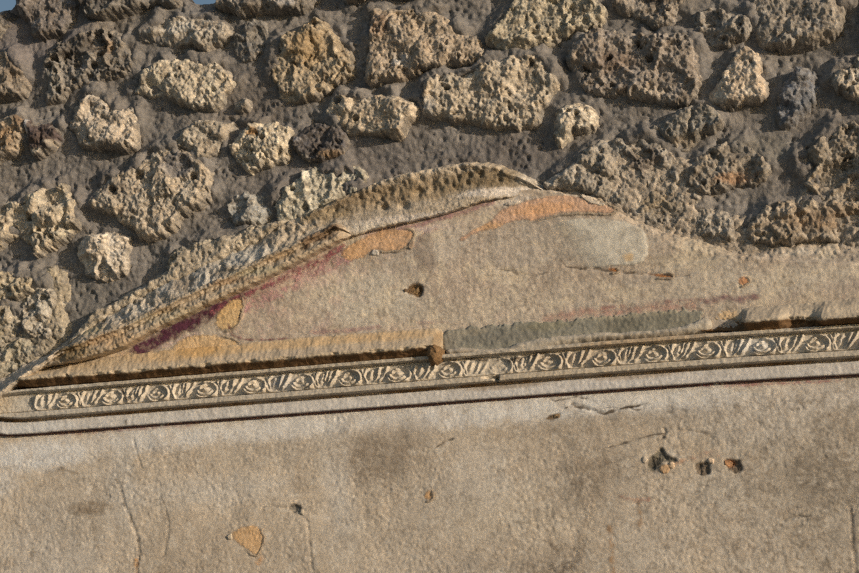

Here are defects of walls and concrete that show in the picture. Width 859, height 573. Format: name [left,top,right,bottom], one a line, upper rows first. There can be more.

flaking render [460,194,619,240]
flaking render [342,227,416,260]
spalling [404,284,423,297]
flaking render [173,298,245,350]
crack [553,396,640,415]
spalling [642,448,675,474]
spalling [696,458,742,475]
flaking render [227,526,265,557]